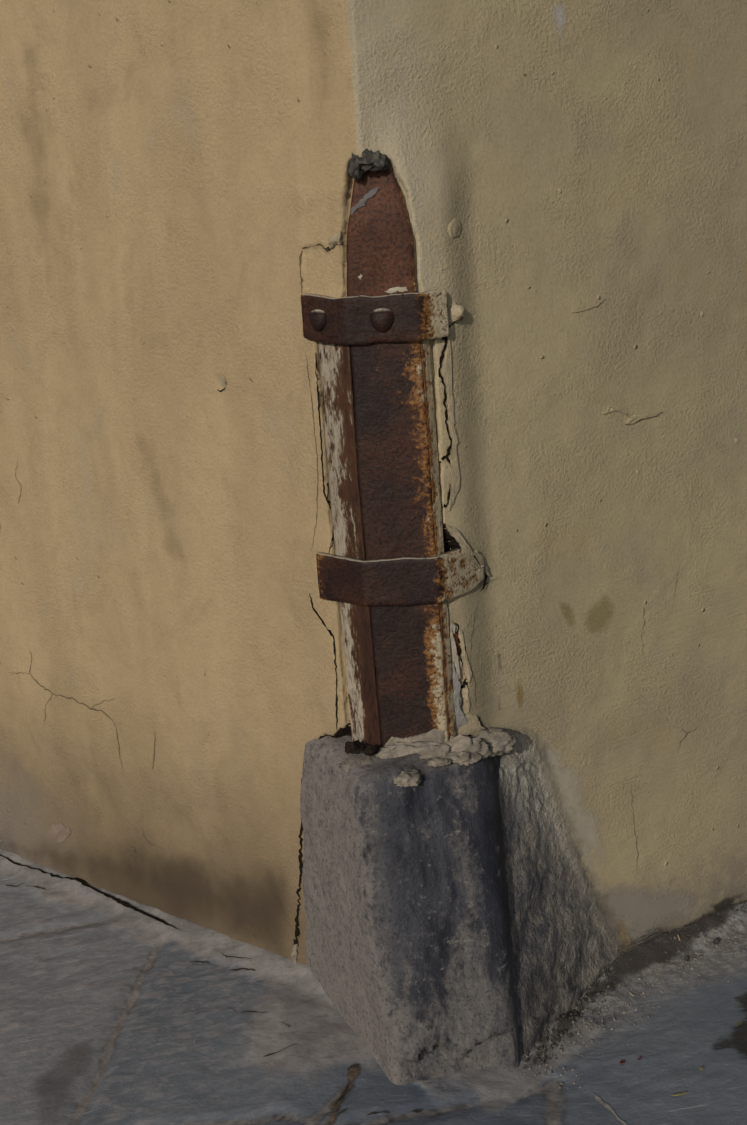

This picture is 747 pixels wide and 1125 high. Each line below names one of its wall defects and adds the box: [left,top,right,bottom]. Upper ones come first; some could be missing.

crack [438,302,460,522]
flaking render [441,506,497,592]
crack [12,652,122,763]
spalling [319,720,352,739]
flaking render [449,624,488,736]
crack [0,855,180,930]
crack [291,820,303,964]
crack [194,952,262,982]
crack [228,1006,295,1057]
damp [714,992,747,1059]